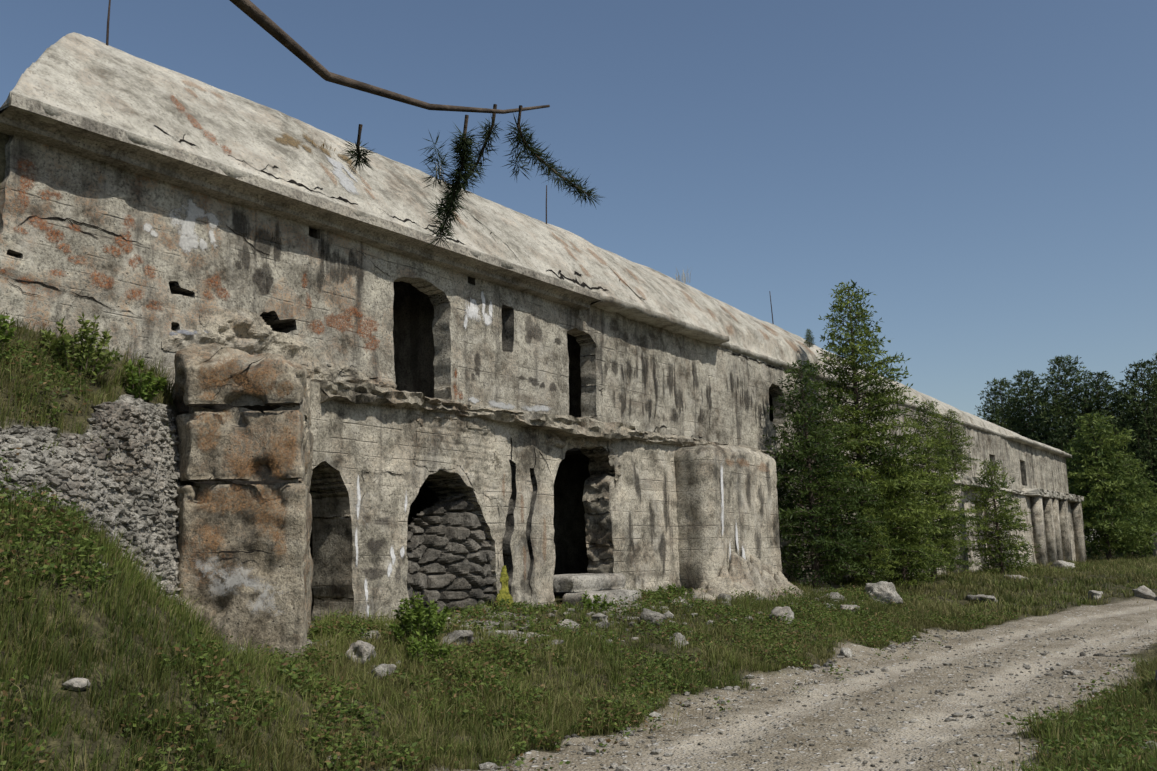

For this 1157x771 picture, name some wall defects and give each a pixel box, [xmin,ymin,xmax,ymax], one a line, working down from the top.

crack [228,155,357,204]
corrosion [14,160,113,288]
crack [18,215,143,245]
corrosion [104,215,155,278]
water stain [317,239,364,290]
corrosion [302,273,380,350]
spalling [169,306,397,389]
spalling [469,397,549,411]
water stain [605,355,683,424]
water stain [692,362,712,425]
flaking render [413,412,501,499]
crack [496,439,552,597]